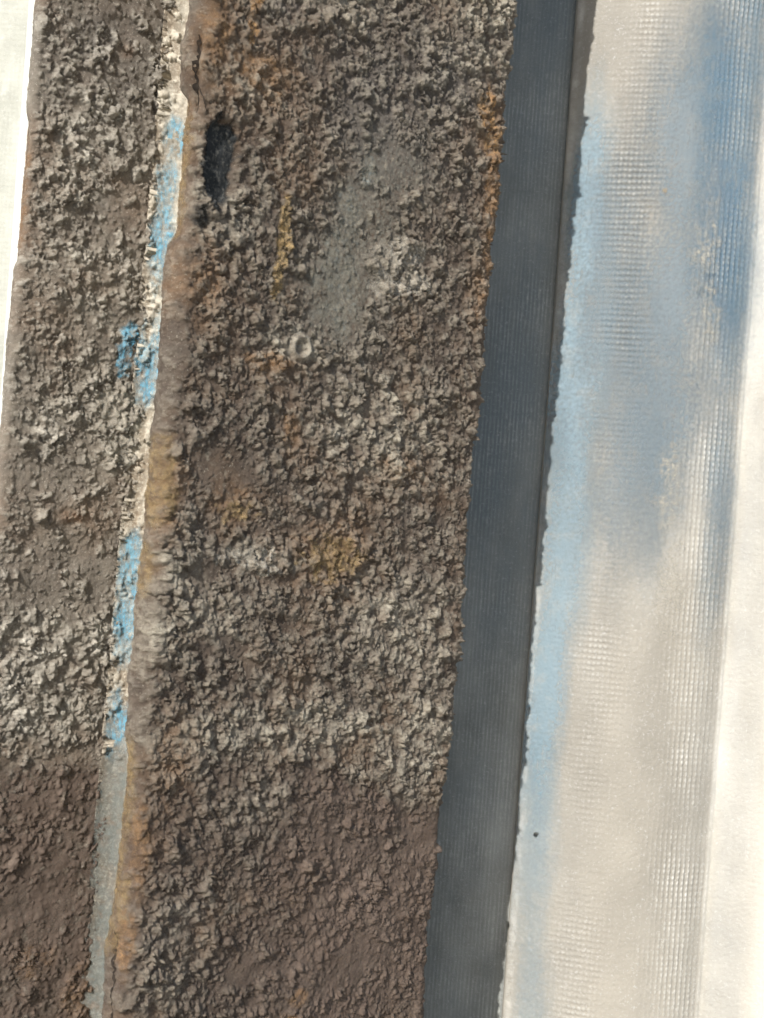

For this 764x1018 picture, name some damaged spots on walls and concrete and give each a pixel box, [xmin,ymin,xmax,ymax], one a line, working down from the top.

crack [192,35,207,113]
spalling [200,112,237,209]
peeling [150,169,176,260]
peeling [116,323,160,401]
peeling [114,536,140,643]
peeling [112,703,127,741]
crack [110,931,118,1018]